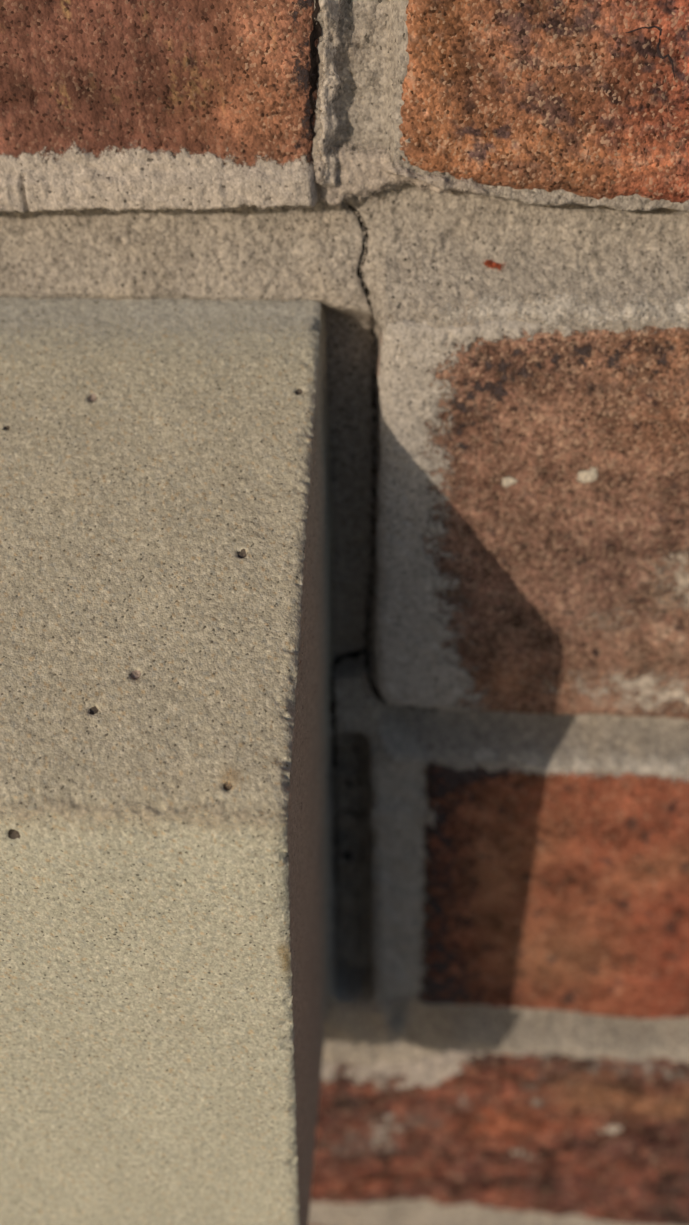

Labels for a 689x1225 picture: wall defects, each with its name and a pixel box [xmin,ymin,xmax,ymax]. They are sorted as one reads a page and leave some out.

crack [329,198,419,927]